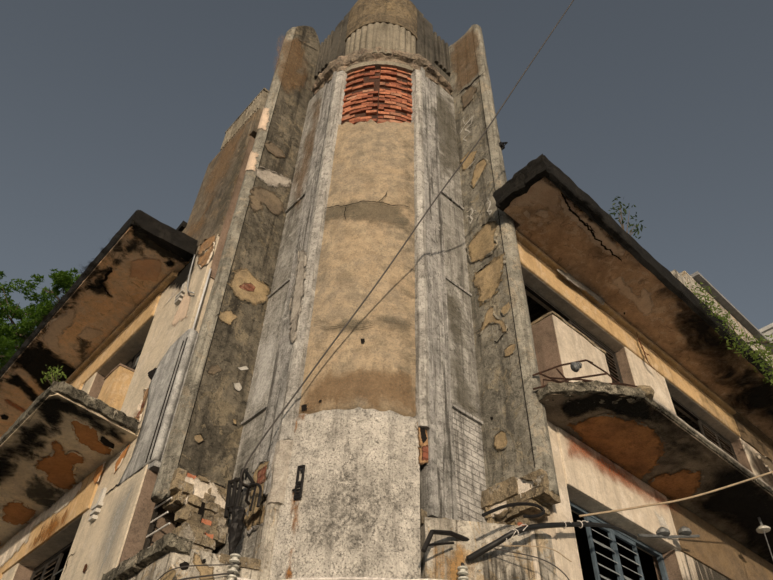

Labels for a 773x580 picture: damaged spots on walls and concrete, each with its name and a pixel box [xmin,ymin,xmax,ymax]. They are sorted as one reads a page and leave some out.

crack [327,192,408,219]
crack [561,192,622,261]
spalling [226,268,271,306]
damp [0,222,197,484]
damp [660,289,773,421]
spalling [415,421,430,465]
damp [26,476,62,508]
spalling [0,418,130,567]
spalling [178,475,226,518]
spalling [485,477,538,519]
damp [697,453,773,564]
damp [684,553,730,580]